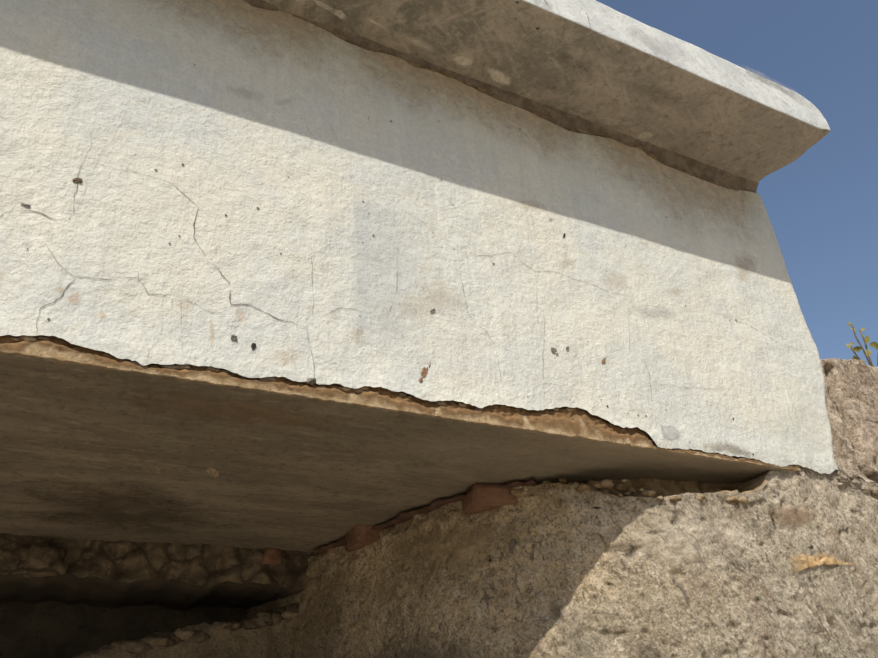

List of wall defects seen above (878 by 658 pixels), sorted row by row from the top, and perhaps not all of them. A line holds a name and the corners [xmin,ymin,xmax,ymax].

crack [36,277,156,336]
crack [187,271,298,325]
spalling [0,335,801,505]